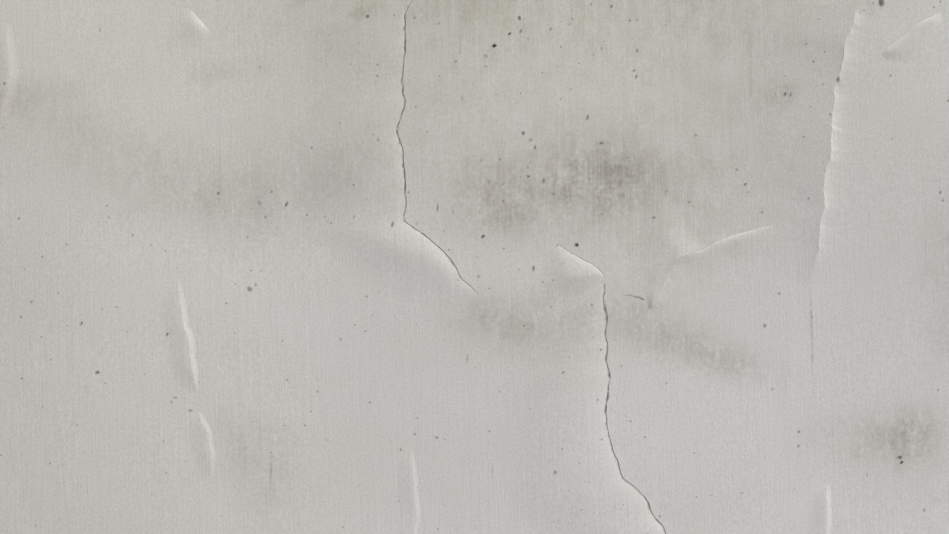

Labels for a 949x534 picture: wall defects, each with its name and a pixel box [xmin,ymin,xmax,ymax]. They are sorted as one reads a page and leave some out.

crack [295,0,479,306]
crack [496,243,679,534]